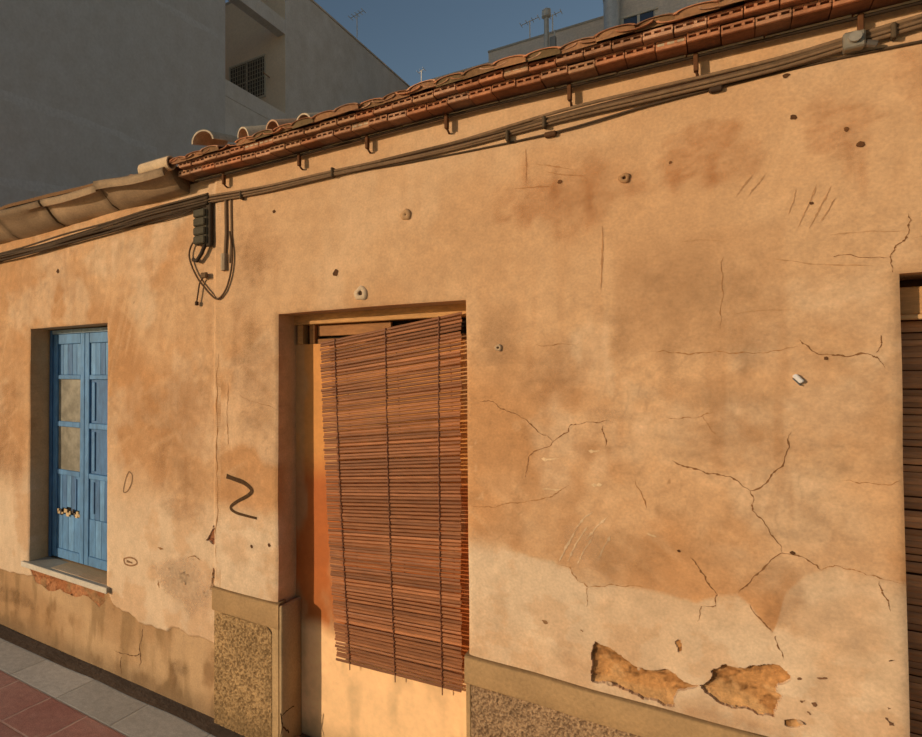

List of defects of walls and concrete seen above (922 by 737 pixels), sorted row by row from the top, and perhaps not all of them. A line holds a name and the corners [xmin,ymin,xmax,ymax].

crack [834,214,911,272]
crack [650,336,885,367]
crack [675,433,898,656]
spalling [31,570,105,607]
crack [556,563,641,607]
spalling [592,642,790,715]
spalling [785,719,804,727]